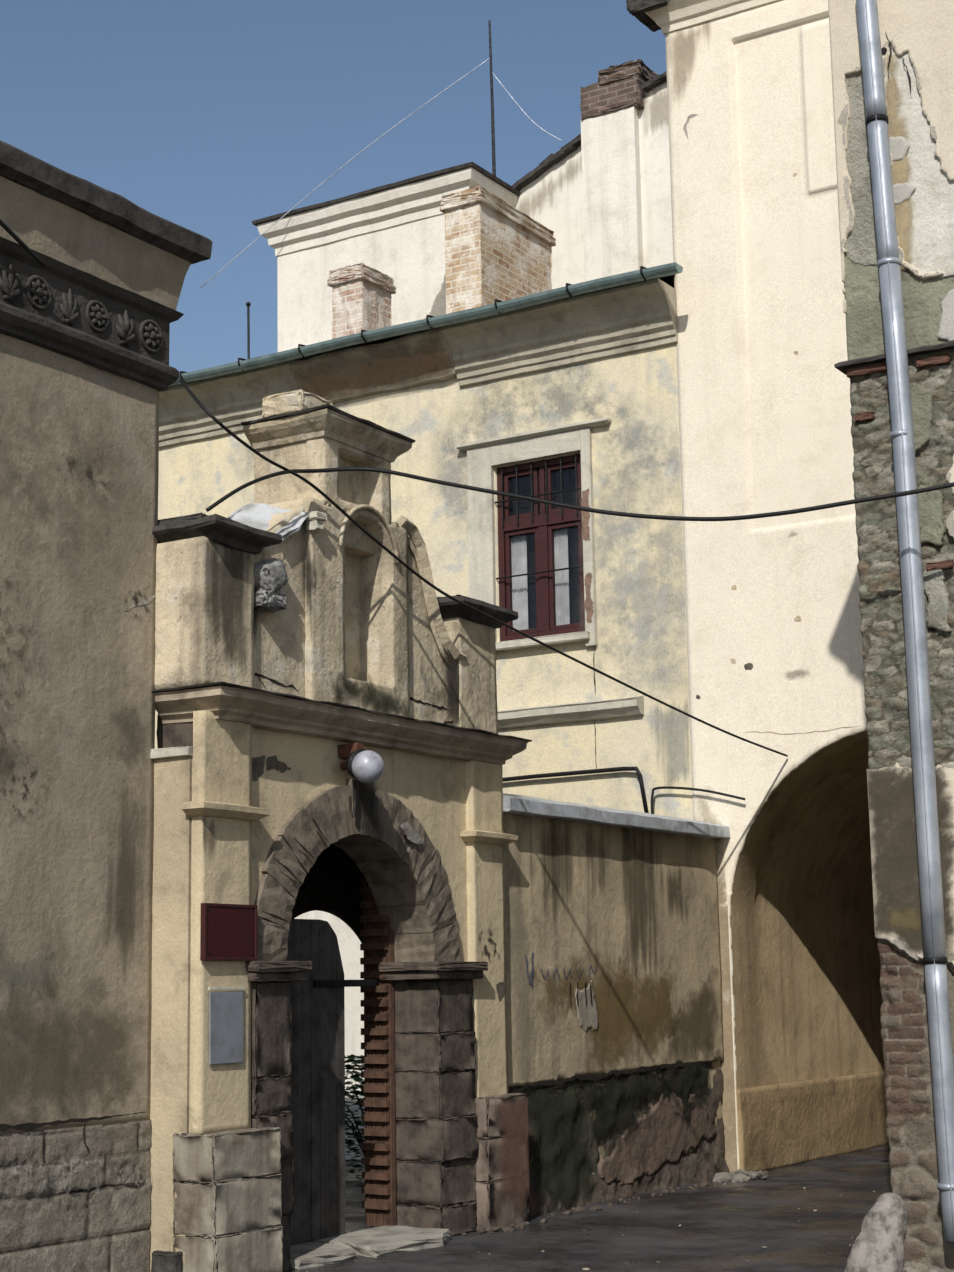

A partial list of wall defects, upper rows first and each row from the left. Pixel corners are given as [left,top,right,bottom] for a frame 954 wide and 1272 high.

flaking render [838,67,913,771]
flaking render [882,40,954,768]
water stain [207,546,258,655]
water stain [302,522,313,608]
water stain [445,649,459,722]
spalling [252,755,291,782]
water stain [655,709,688,785]
water stain [116,829,134,948]
water stain [534,803,738,1173]
water stain [0,1007,130,1125]
water stain [500,1098,529,1198]
flaking render [877,937,954,1272]